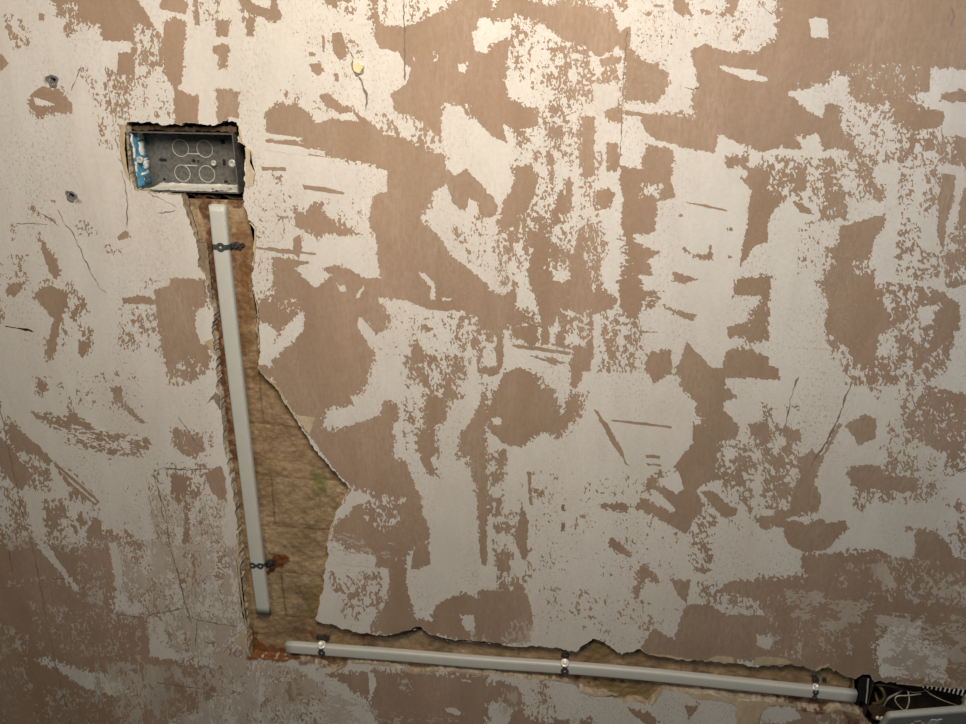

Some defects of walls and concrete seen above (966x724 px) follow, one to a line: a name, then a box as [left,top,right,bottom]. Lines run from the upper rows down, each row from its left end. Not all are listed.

peeling [0,13,32,71]
peeling [27,85,73,123]
peeling [49,0,256,188]
peeling [238,0,284,37]
peeling [76,220,131,256]
peeling [0,232,97,362]
peeling [117,277,216,387]
peeling [249,0,966,689]
crack [0,404,71,724]
peeling [0,370,595,724]
peeling [627,707,661,724]
peeling [685,701,700,720]